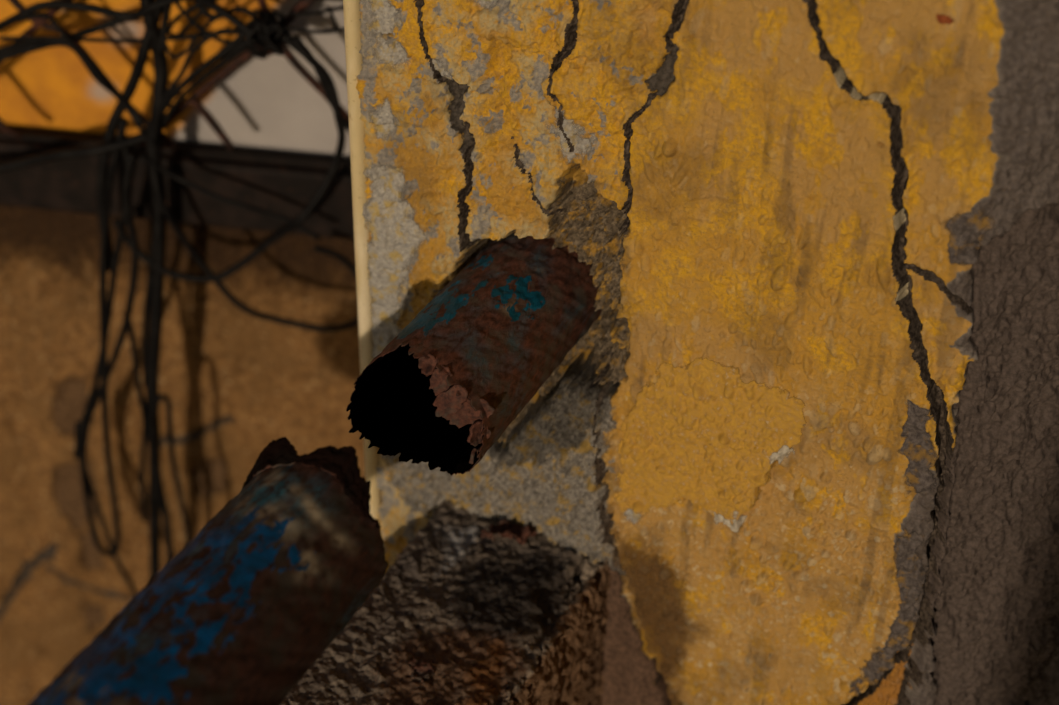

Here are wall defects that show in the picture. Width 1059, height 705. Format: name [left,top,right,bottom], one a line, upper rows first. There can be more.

crack [414,0,464,85]
crack [546,0,579,152]
crack [663,0,689,53]
peeling [936,14,954,25]
crack [457,121,480,252]
crack [511,136,564,216]
crack [619,92,658,235]
peeling [365,164,426,358]
flaking render [381,101,806,575]
crack [802,0,973,705]
flaking render [849,202,1059,705]